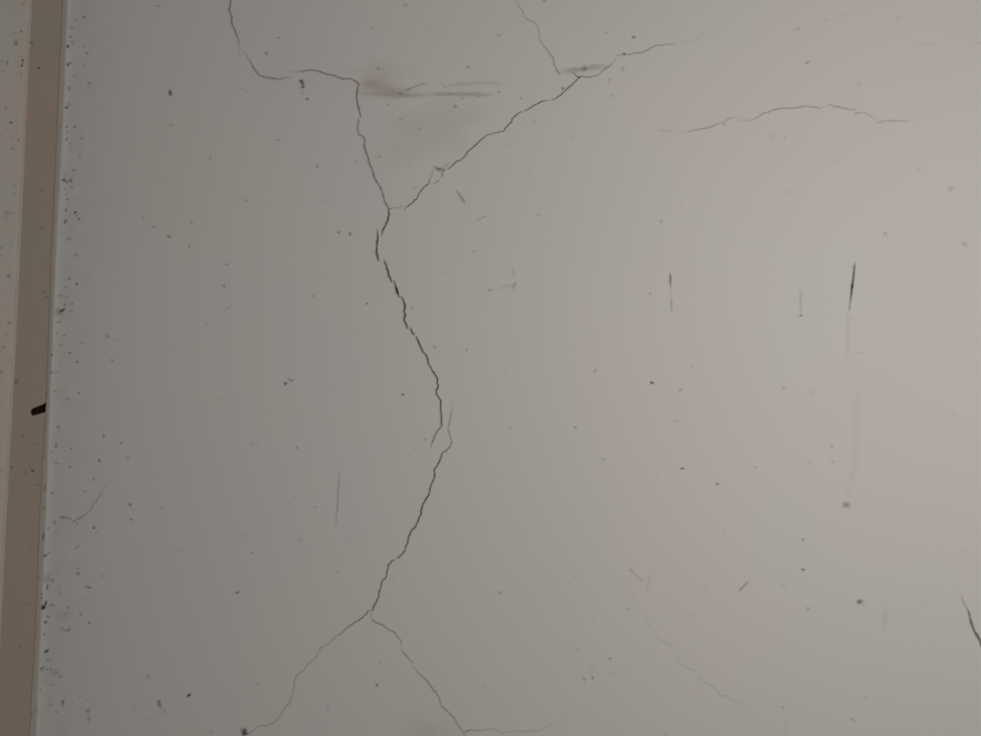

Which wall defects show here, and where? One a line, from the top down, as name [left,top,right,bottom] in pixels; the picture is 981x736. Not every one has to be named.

crack [227,0,677,733]